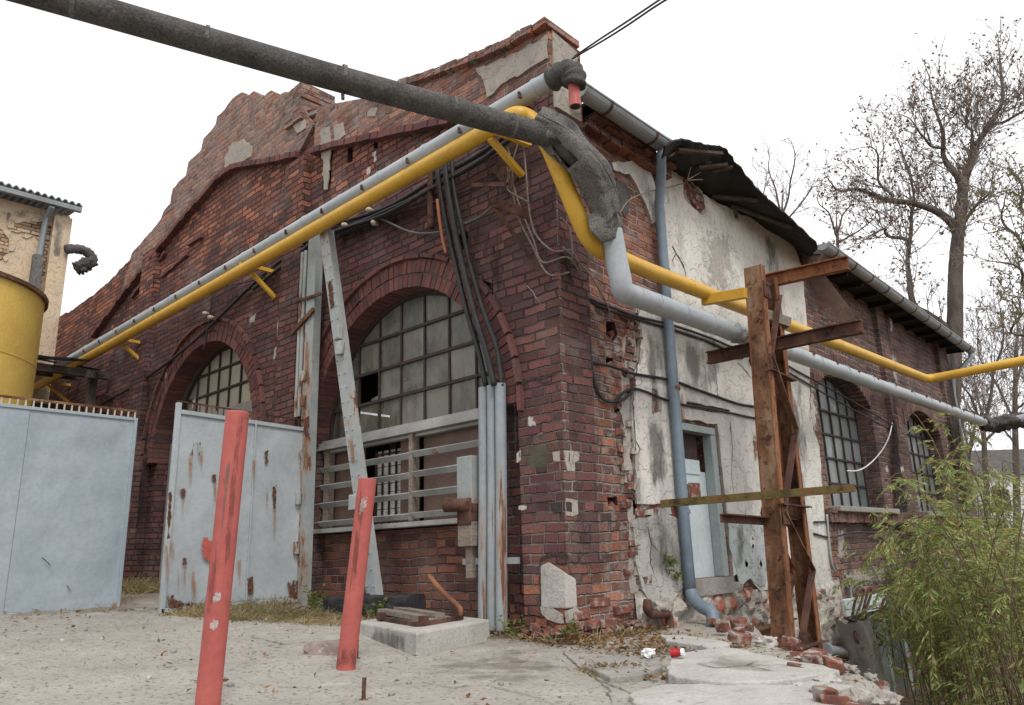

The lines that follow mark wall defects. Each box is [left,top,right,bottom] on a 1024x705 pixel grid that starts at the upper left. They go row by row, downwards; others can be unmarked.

flaking render [683,176,706,215]
corrosion [298,416,310,481]
spalling [606,309,678,595]
corrosion [166,488,186,565]
corrosion [166,558,199,611]
corrosion [238,560,254,594]